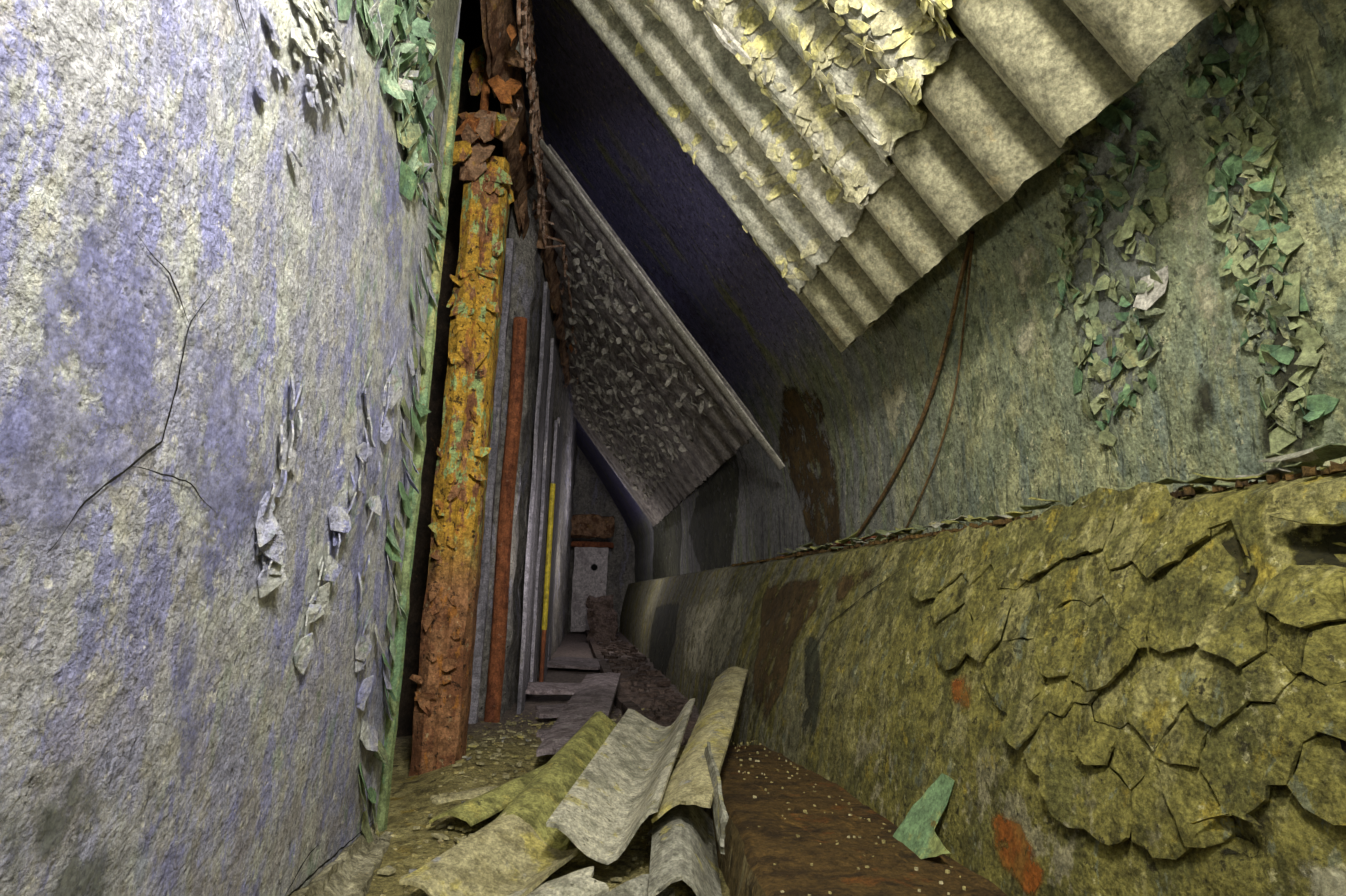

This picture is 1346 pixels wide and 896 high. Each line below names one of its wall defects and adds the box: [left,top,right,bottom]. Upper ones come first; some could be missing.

corrosion [480,0,579,387]
peeling [656,0,951,208]
damp [779,386,841,546]
flaking render [775,0,1346,860]
crack [804,568,904,692]
crack [1338,738,1346,753]